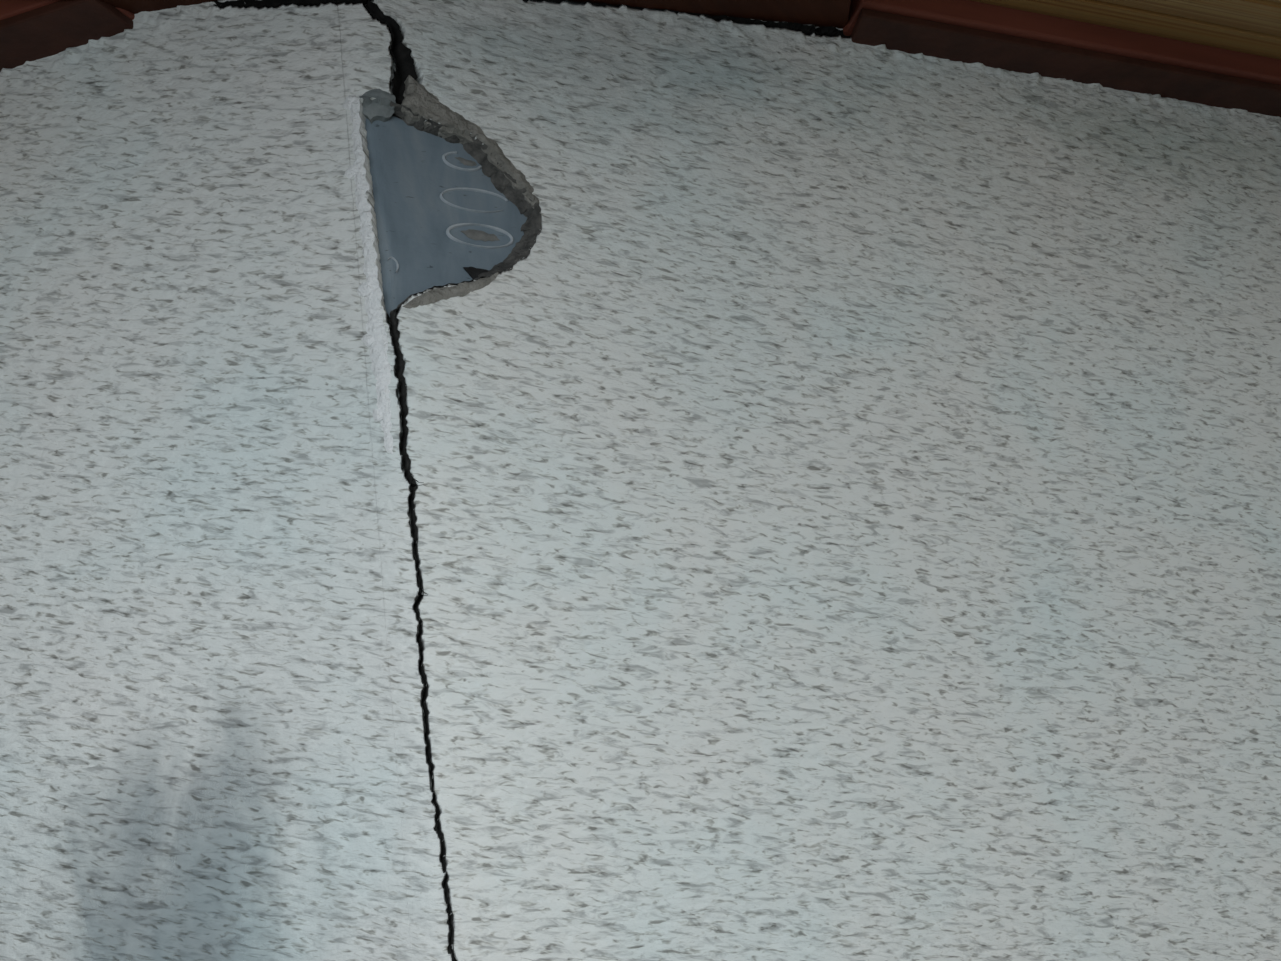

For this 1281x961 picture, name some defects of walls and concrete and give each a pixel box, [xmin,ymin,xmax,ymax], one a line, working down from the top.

crack [213,0,418,119]
crack [523,0,851,38]
flaking render [342,75,542,454]
crack [387,306,457,961]